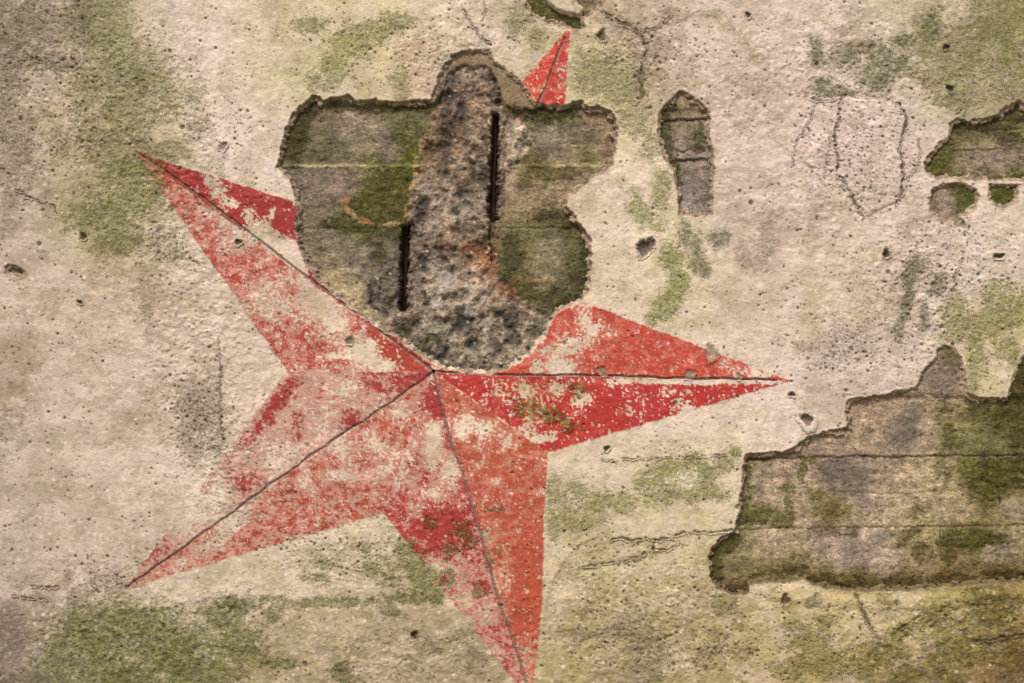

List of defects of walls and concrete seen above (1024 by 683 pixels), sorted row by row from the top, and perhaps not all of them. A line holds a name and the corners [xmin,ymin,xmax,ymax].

spalling [275,48,619,377]
rust [339,134,555,322]
rust [482,114,507,225]
spalling [657,89,716,219]
crack [790,96,865,218]
crack [892,101,922,207]
spalling [923,98,1024,228]
spalling [705,342,1024,597]
crack [578,528,735,569]